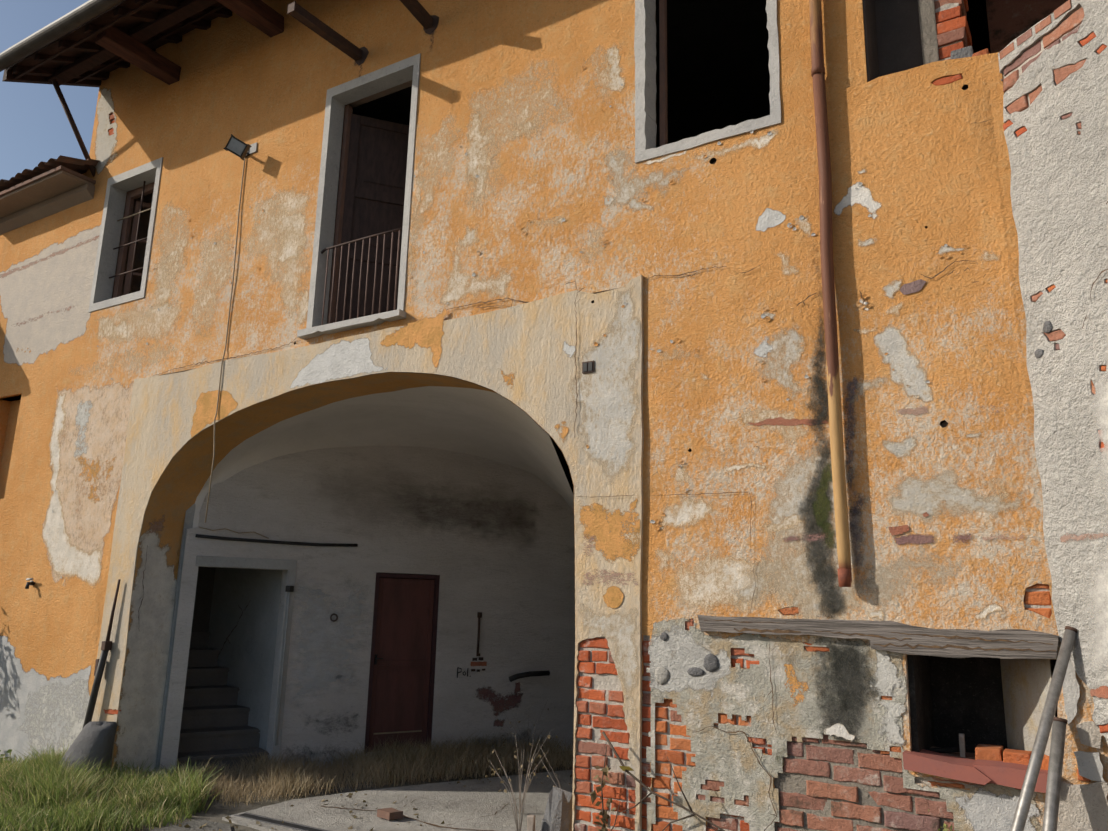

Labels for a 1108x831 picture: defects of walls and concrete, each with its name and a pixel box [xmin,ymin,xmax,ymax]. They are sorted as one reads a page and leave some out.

flaking render [0,204,192,366]
peeling [290,227,511,388]
crack [439,298,528,312]
crack [649,263,763,278]
water stain [799,318,844,618]
water stain [845,378,862,565]
peeling [0,635,91,766]
crack [688,726,777,831]
crack [767,643,777,733]
flaking render [574,447,1043,831]
water stain [814,640,878,745]
spalling [1057,660,1108,831]